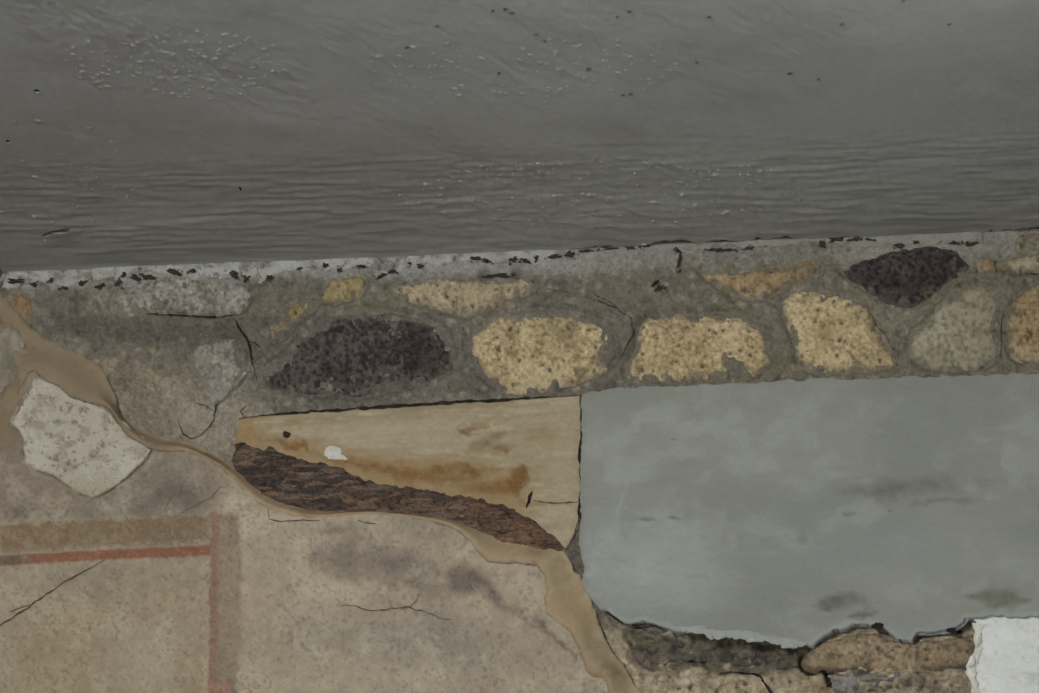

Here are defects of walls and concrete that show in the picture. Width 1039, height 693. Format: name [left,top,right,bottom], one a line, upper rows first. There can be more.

flaking render [10,375,151,499]
crack [146,313,582,543]
crack [0,560,105,626]
spalling [634,625,807,670]
crack [725,671,773,693]
crack [800,657,832,688]
spalling [827,669,918,693]
flaking render [917,618,985,693]